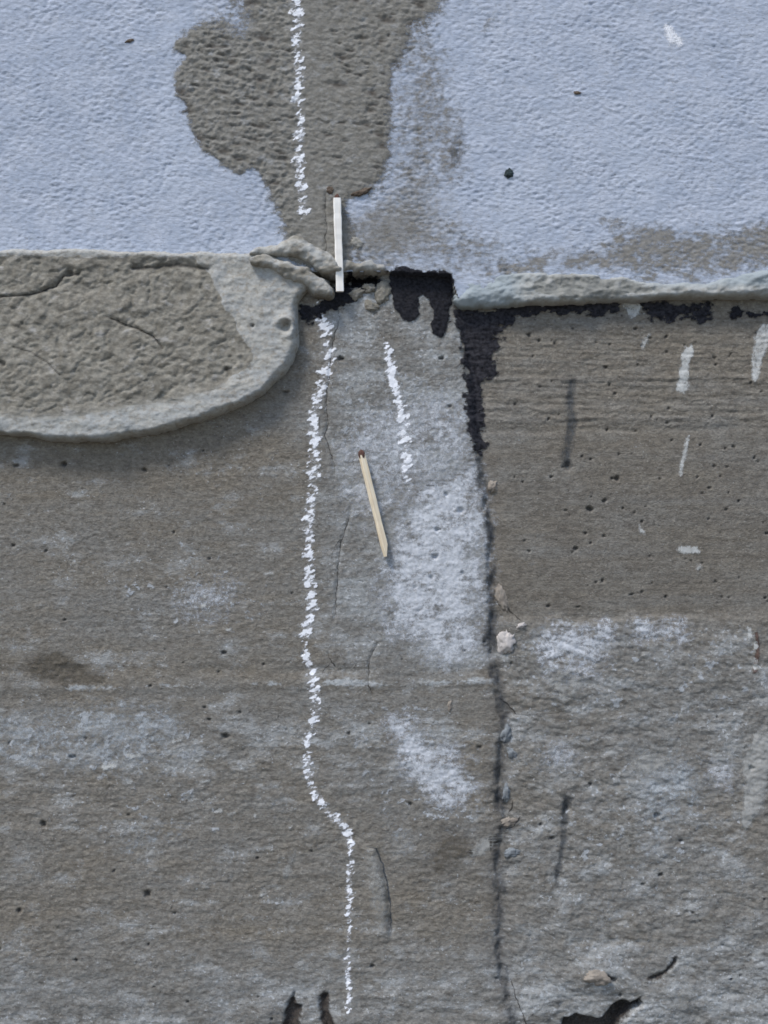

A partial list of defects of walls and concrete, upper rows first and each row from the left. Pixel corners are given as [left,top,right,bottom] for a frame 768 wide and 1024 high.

peeling [172,0,443,261]
leakage [333,393,496,671]
leakage [530,617,689,681]
leakage [380,712,482,813]
leakage [641,757,733,833]
leakage [556,798,571,879]
spalling [562,998,641,1024]